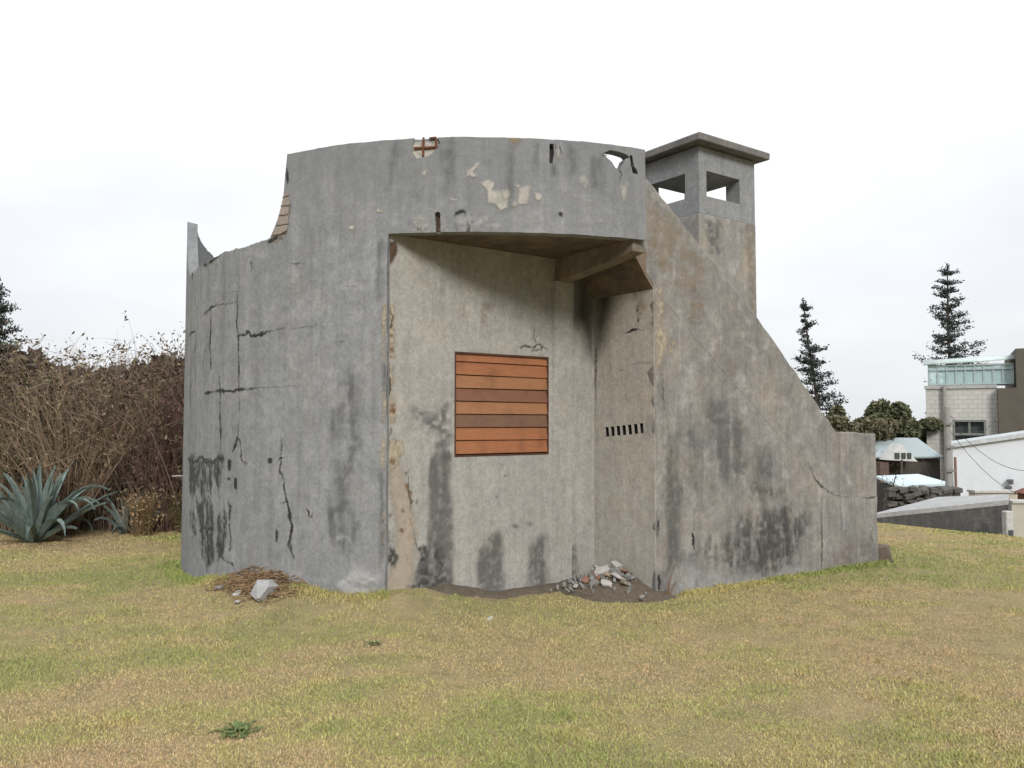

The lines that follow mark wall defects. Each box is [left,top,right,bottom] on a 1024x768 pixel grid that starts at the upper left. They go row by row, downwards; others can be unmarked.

spalling [268,168,290,243]
peeling [467,163,542,210]
crack [189,304,267,461]
leakage [188,455,234,566]
crack [275,445,294,557]
leakage [412,449,452,588]
leakage [478,534,502,591]
leakage [530,537,545,585]